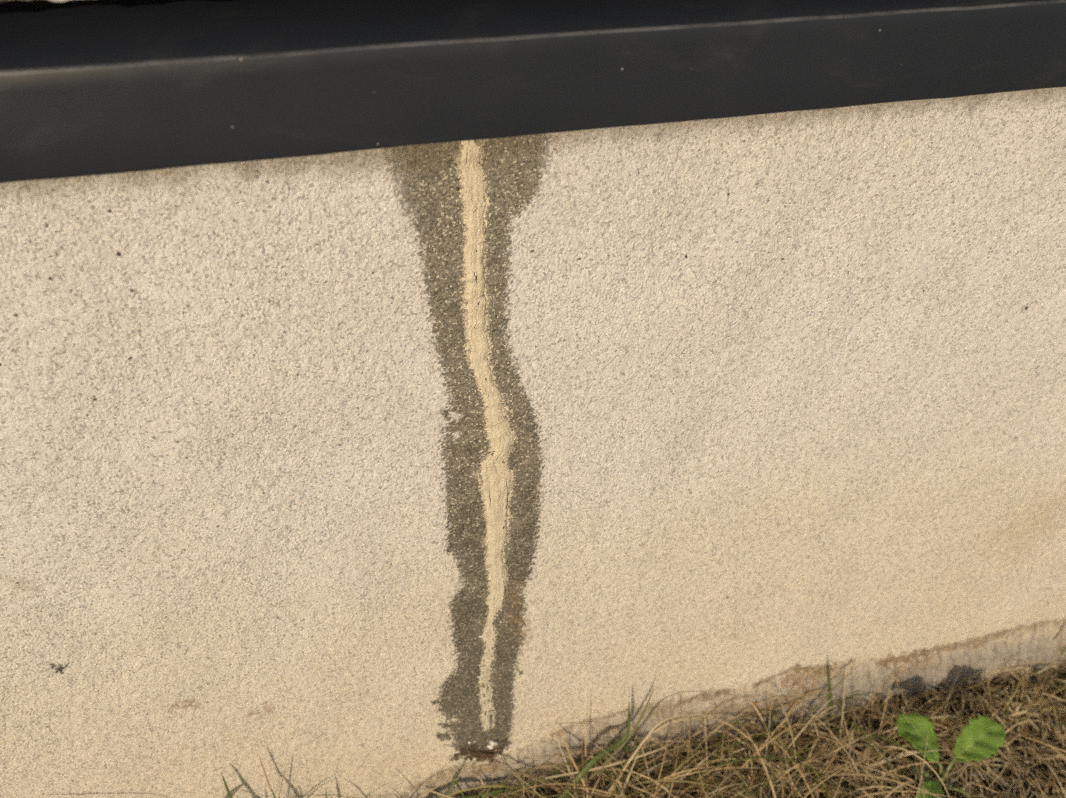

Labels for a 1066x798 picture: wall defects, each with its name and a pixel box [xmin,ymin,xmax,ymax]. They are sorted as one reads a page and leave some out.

water stain [386,134,549,751]
crack [454,139,518,757]